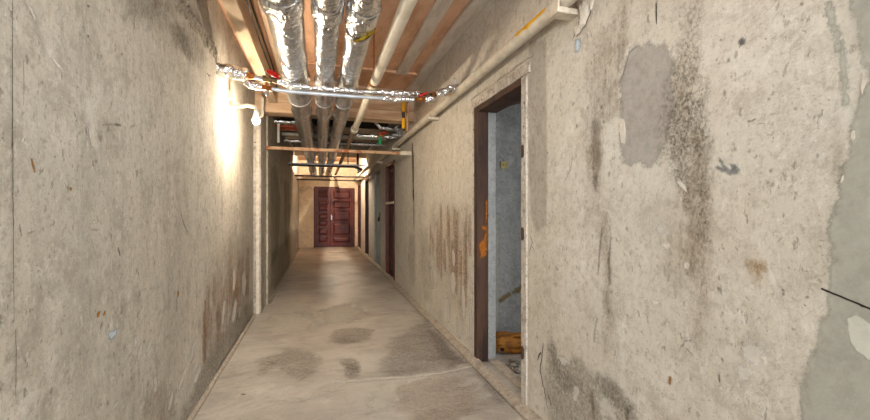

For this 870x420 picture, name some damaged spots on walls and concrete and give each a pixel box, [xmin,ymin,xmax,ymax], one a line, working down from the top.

peeling [619,44,676,174]
peeling [801,0,870,420]
rust [203,255,249,356]
water stain [596,397,617,420]